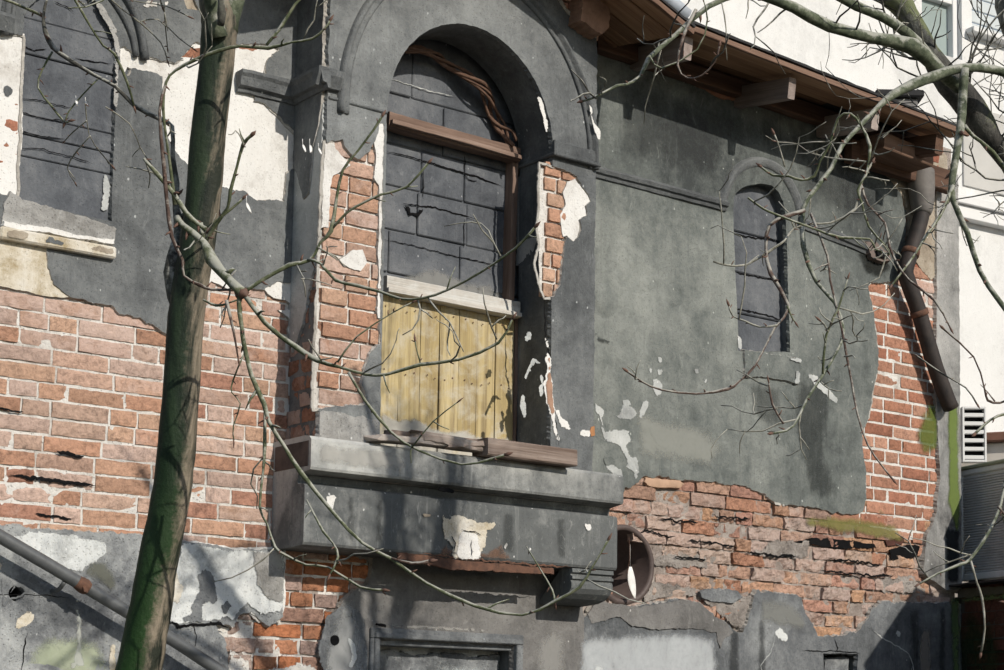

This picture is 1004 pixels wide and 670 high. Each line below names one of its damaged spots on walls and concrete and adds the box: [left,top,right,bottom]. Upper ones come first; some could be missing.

spalling [0,34,26,196]
spalling [96,3,200,164]
spalling [516,161,590,300]
spalling [914,200,935,329]
spalling [933,152,951,170]
crack [11,451,96,486]
spalling [0,230,166,571]
spalling [170,44,386,670]
spalling [443,514,496,560]
peeling [524,358,543,396]
spalling [556,279,950,636]
peeling [775,628,788,642]